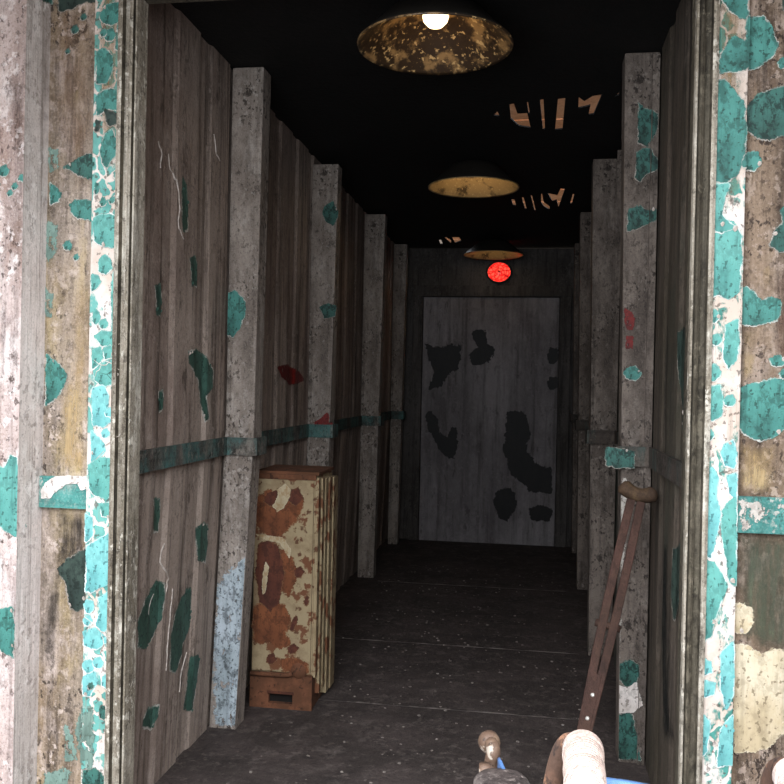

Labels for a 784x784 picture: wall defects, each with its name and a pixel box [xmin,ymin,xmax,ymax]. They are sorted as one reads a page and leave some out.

peeling [0,164,23,197]
peeling [710,0,784,442]
peeling [40,0,119,784]
peeling [0,454,26,537]
peeling [705,439,784,643]
peeling [703,602,784,768]